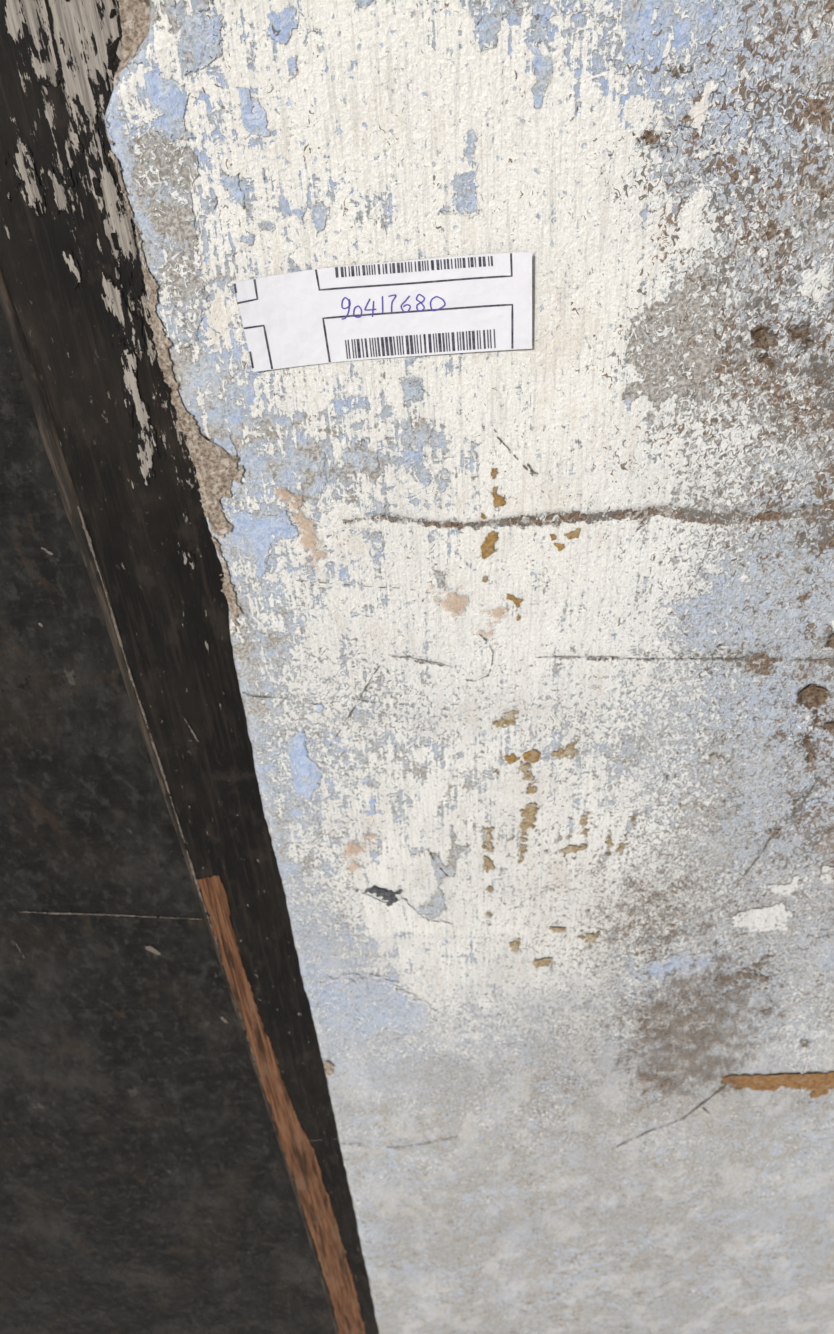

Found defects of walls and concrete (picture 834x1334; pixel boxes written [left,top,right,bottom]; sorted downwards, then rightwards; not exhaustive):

peeling [291,202,330,233]
peeling [434,129,484,218]
peeling [0,0,300,635]
peeling [392,356,449,509]
peeling [297,440,389,551]
peeling [432,569,448,589]
rust [429,586,469,617]
rust [477,608,508,646]
peeling [481,468,505,559]
peeling [506,594,523,621]
crack [342,500,834,591]
peeling [651,530,834,869]